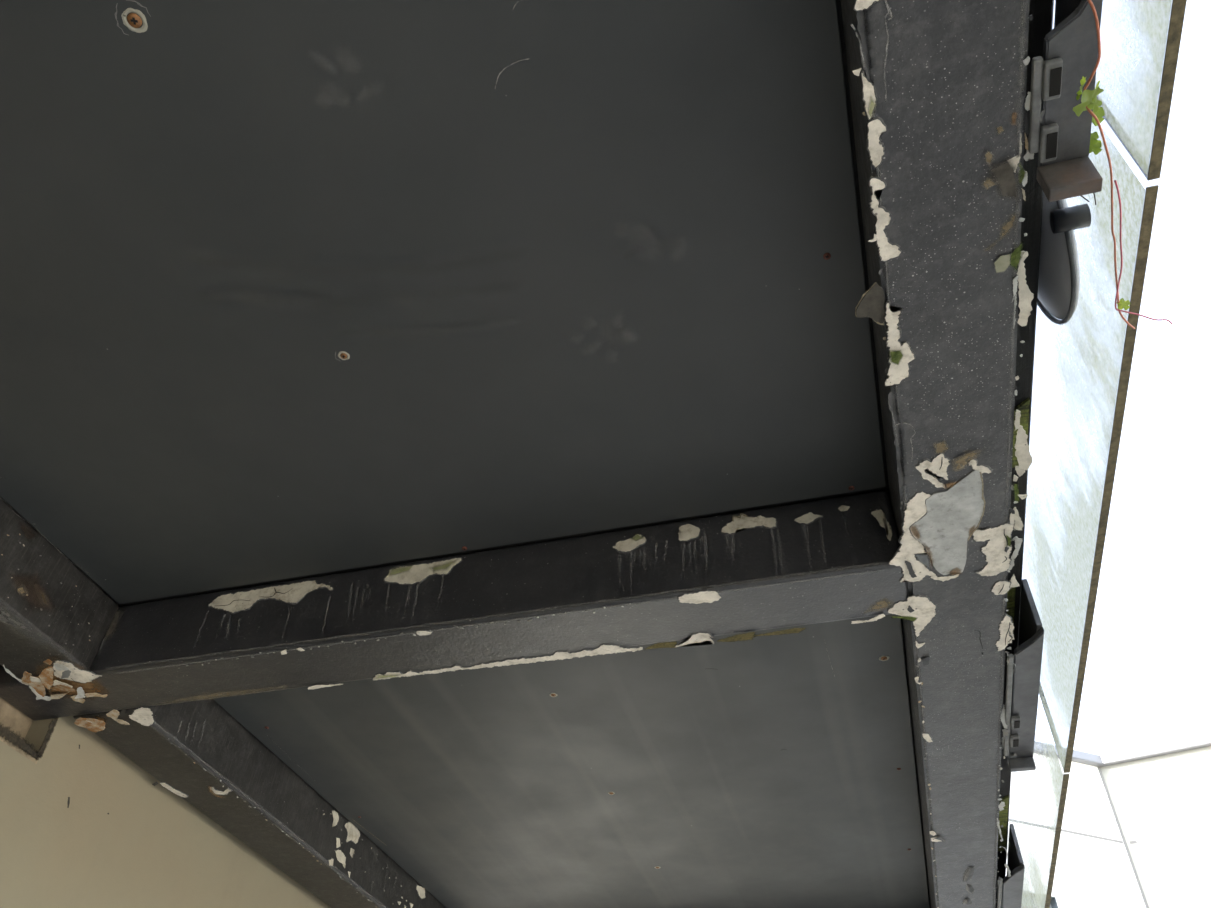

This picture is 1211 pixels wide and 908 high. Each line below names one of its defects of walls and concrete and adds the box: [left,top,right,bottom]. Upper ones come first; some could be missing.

peeling [851,0,902,288]
peeling [1012,218,1034,327]
peeling [851,302,1033,685]
peeling [613,534,647,553]
peeling [678,524,701,542]
peeling [721,513,777,535]
peeling [383,557,463,585]
peeling [678,589,722,604]
peeling [674,632,718,647]
peeling [372,643,643,681]
spalling [3,659,154,732]
peeling [209,780,426,908]